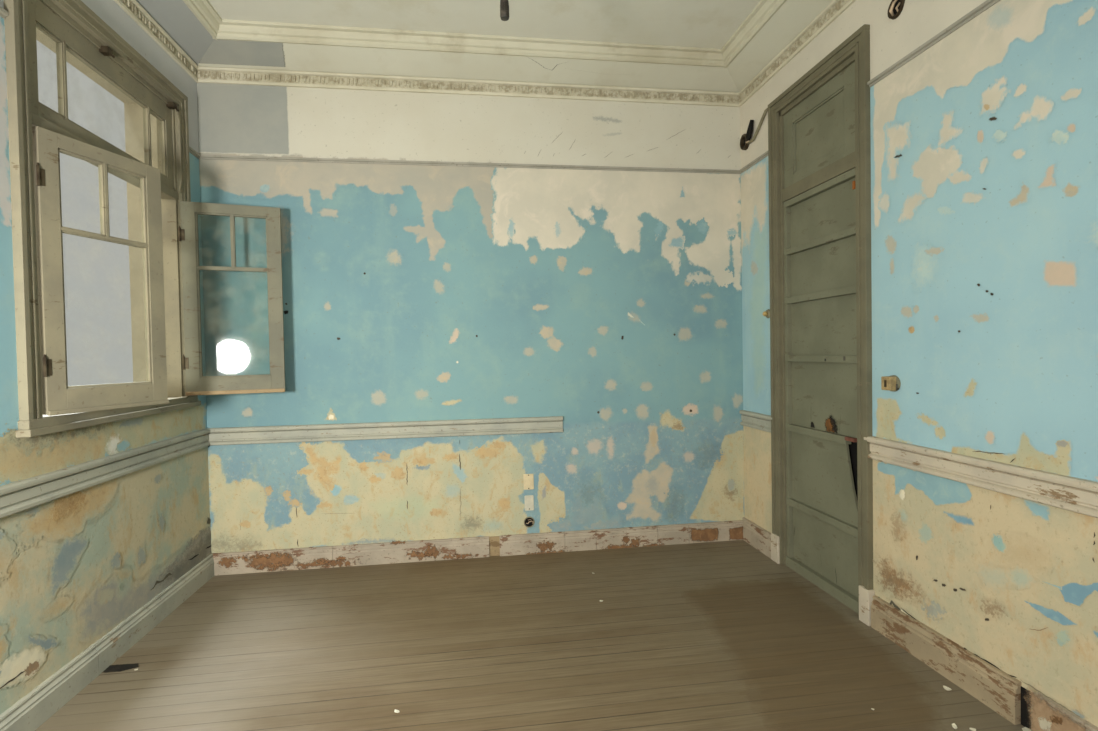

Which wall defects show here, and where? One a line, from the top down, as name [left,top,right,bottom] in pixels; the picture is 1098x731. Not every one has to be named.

peeling [0,16,12,228]
peeling [872,0,1082,275]
peeling [1042,259,1078,288]
peeling [199,152,770,541]
peeling [875,397,1074,477]
peeling [46,533,89,598]
peeling [75,435,568,648]
peeling [877,461,975,545]
peeling [1020,498,1051,522]
peeling [974,533,1098,647]
flaking render [0,633,60,690]
flaking render [1028,689,1085,731]